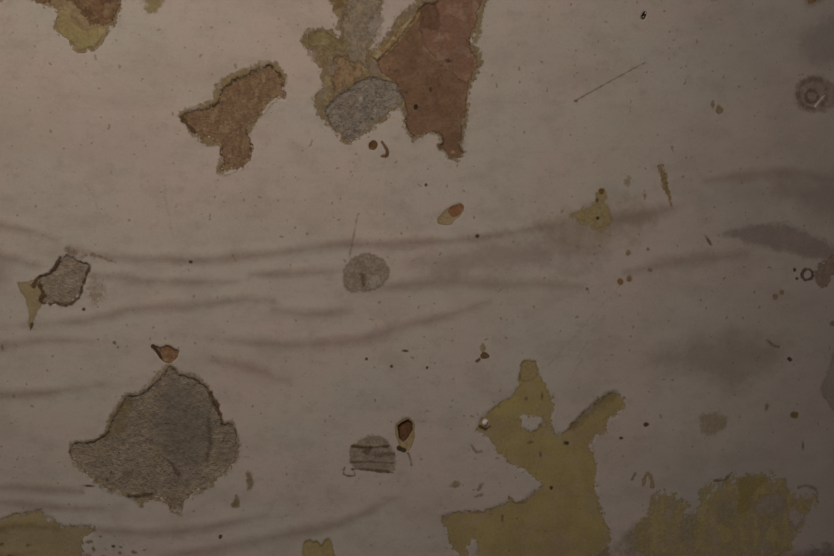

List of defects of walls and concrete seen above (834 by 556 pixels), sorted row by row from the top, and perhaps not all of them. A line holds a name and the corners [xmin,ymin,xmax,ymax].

flaking render [35,0,121,53]
flaking render [179,61,287,175]
flaking render [300,0,487,162]
flaking render [18,254,90,329]
flaking render [69,344,240,515]
peeling [441,360,625,556]
peeling [0,509,102,556]
peeling [302,538,335,556]